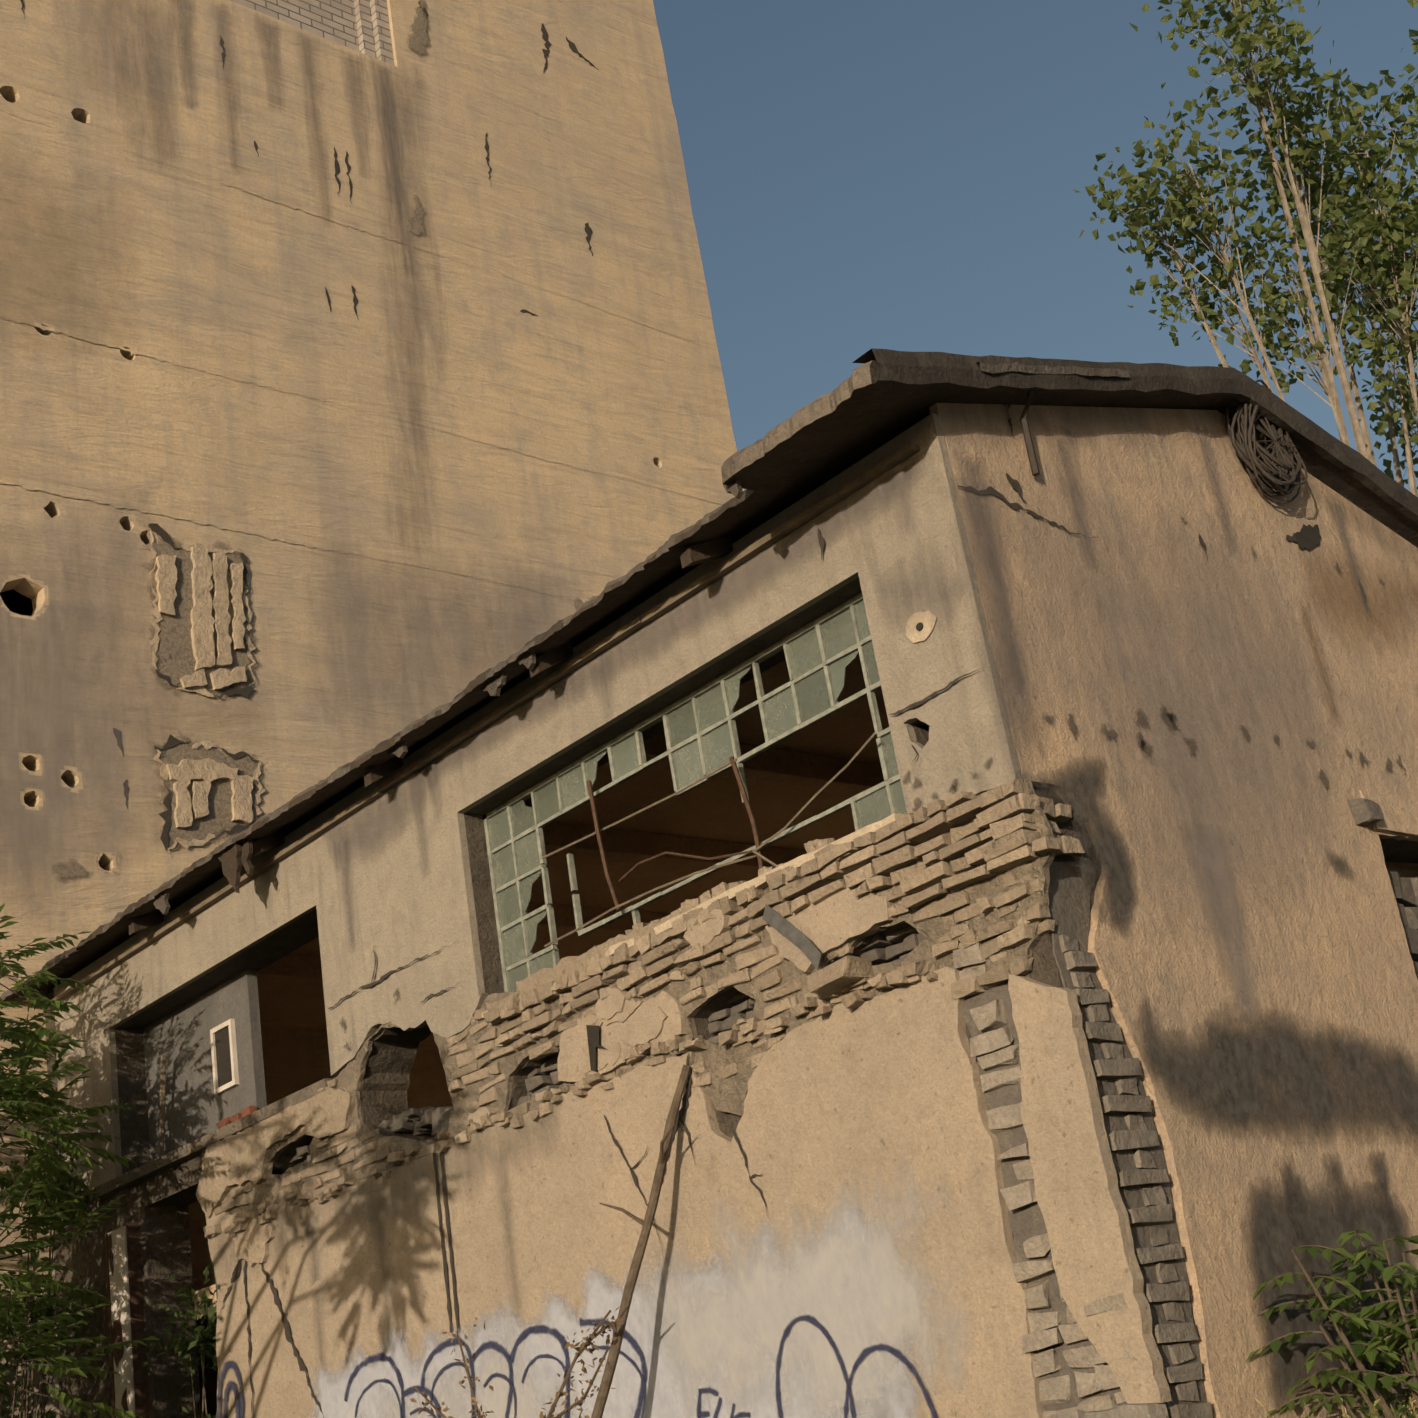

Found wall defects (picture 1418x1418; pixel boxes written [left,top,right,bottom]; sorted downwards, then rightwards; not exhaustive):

crack [957,473,1099,538]
spalling [144,523,258,699]
spalling [1043,714,1078,740]
spalling [1136,706,1196,757]
spalling [152,734,266,851]
spalling [196,758,1213,1418]
crack [218,1259,324,1418]